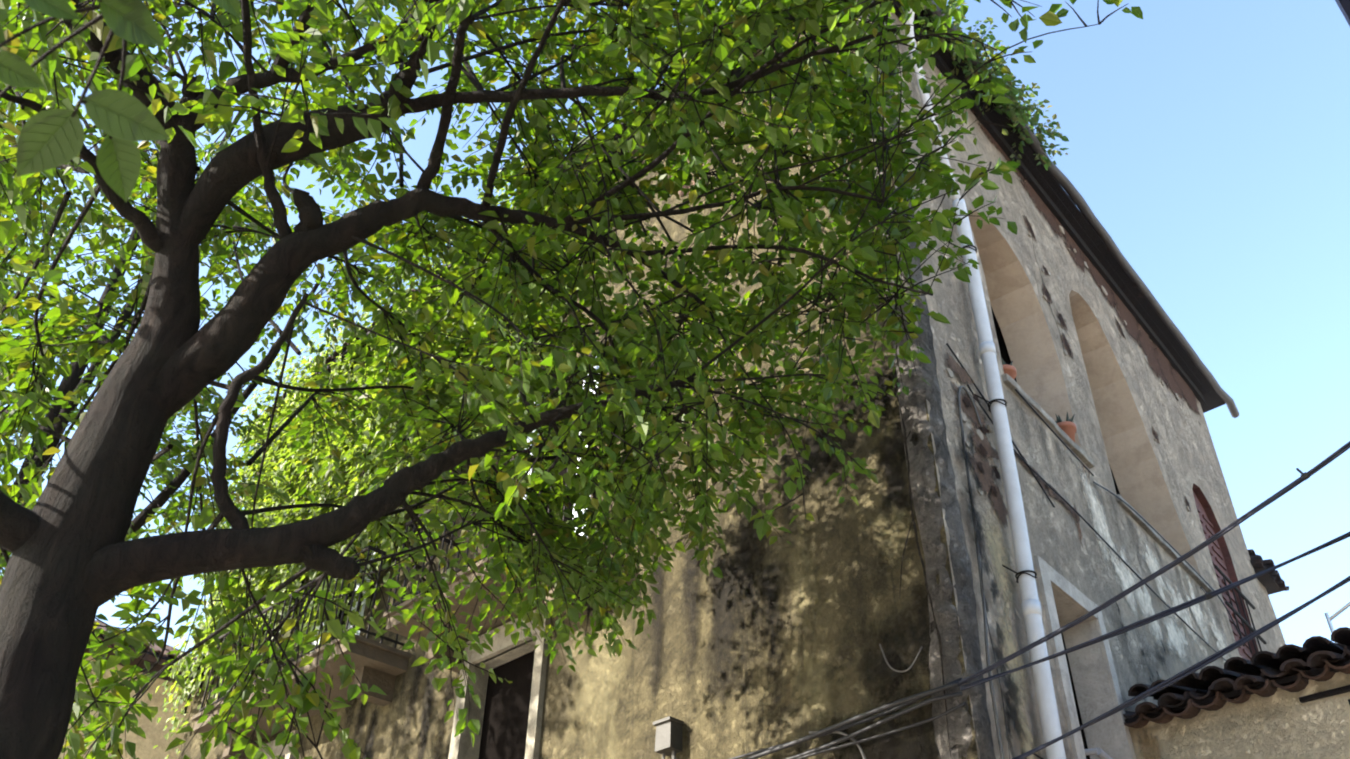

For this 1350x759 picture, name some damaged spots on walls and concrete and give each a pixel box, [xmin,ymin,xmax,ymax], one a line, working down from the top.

water stain [782,366,918,526]
water stain [683,510,781,702]
water stain [819,592,975,759]
spalling [946,353,1080,759]